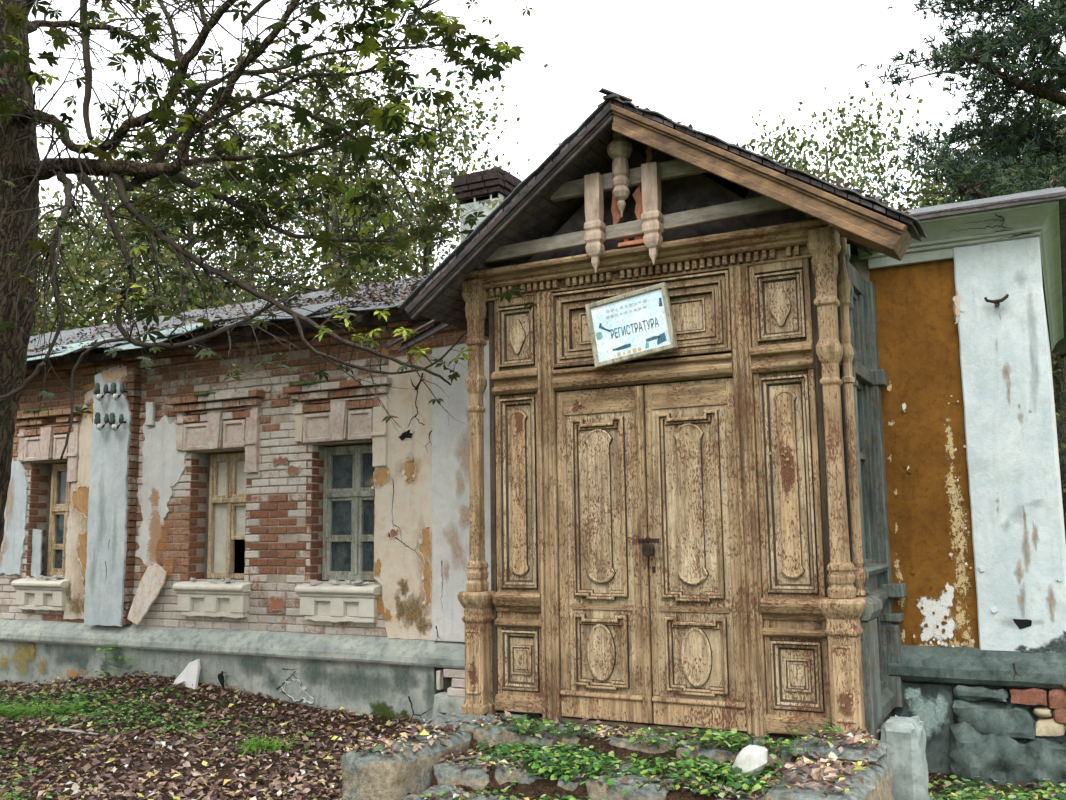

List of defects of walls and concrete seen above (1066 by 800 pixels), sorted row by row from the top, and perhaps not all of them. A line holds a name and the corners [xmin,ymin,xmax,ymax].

spalling [398,428,414,441]
spalling [71,484,89,518]
spalling [371,455,417,489]
peeling [898,395,985,647]
spalling [77,531,88,598]
spalling [415,526,432,607]